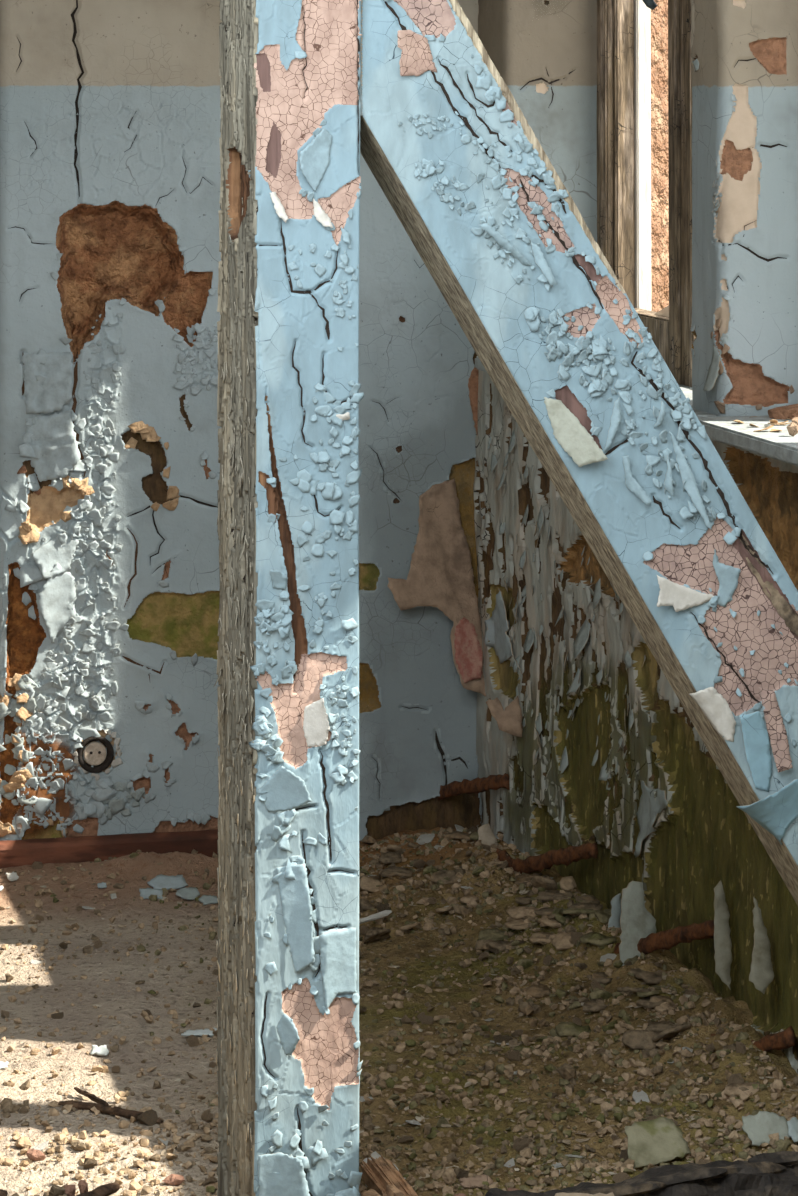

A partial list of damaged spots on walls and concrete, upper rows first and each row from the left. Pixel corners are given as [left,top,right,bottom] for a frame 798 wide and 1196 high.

crack [71,0,84,198]
peeling [230,0,362,320]
crack [431,59,604,309]
spalling [0,201,624,1013]
peeling [588,881,656,966]
peeling [706,880,732,1000]
peeling [749,897,775,994]
crack [251,993,274,1077]
peeling [282,889,402,1126]
peeling [30,1095,193,1192]
crack [297,1108,313,1196]
peeling [494,1080,623,1196]